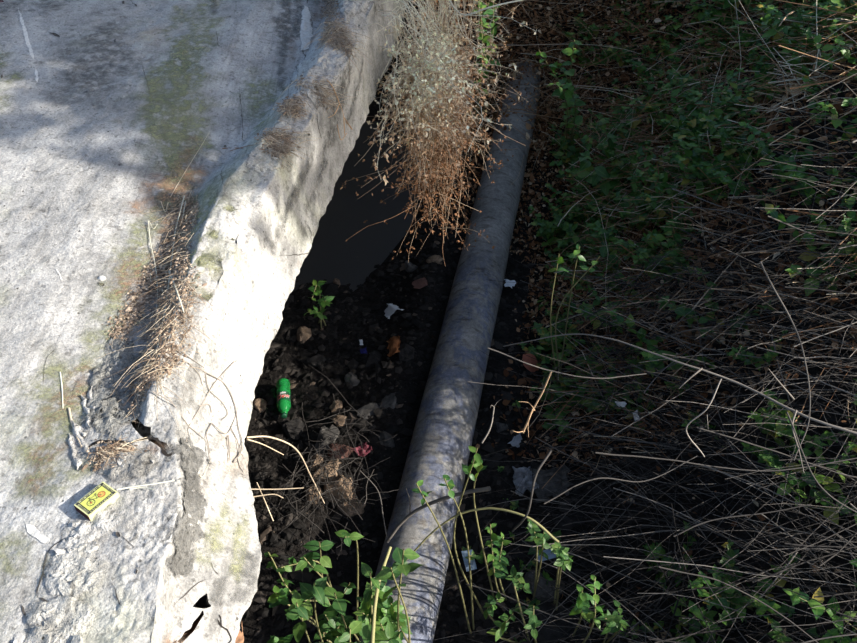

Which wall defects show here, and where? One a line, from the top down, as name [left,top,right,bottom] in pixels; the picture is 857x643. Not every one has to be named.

crack [88,418,174,457]
crack [174,608,232,643]